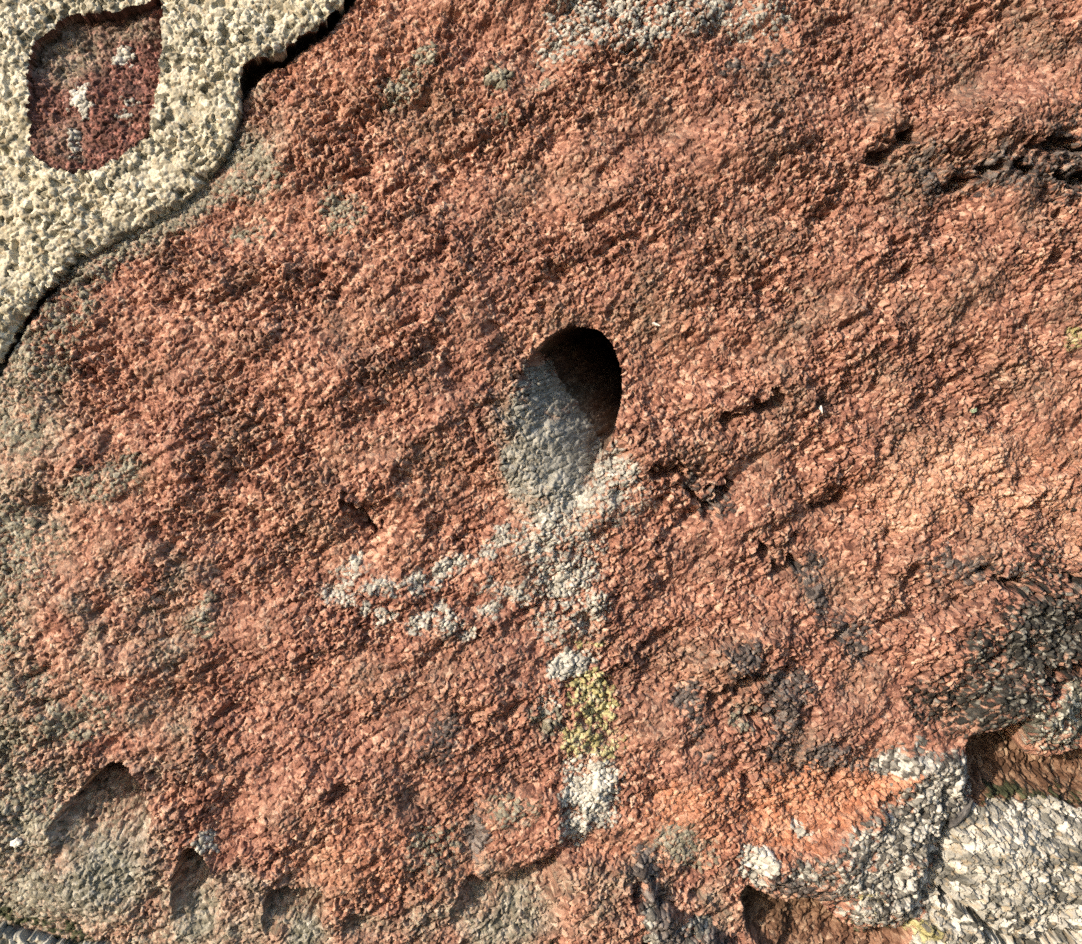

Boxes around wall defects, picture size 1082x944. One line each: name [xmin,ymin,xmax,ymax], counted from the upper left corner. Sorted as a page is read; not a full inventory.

crack [239,0,356,103]
spalling [538,326,623,459]
spalling [946,716,1082,828]
spalling [740,885,917,944]